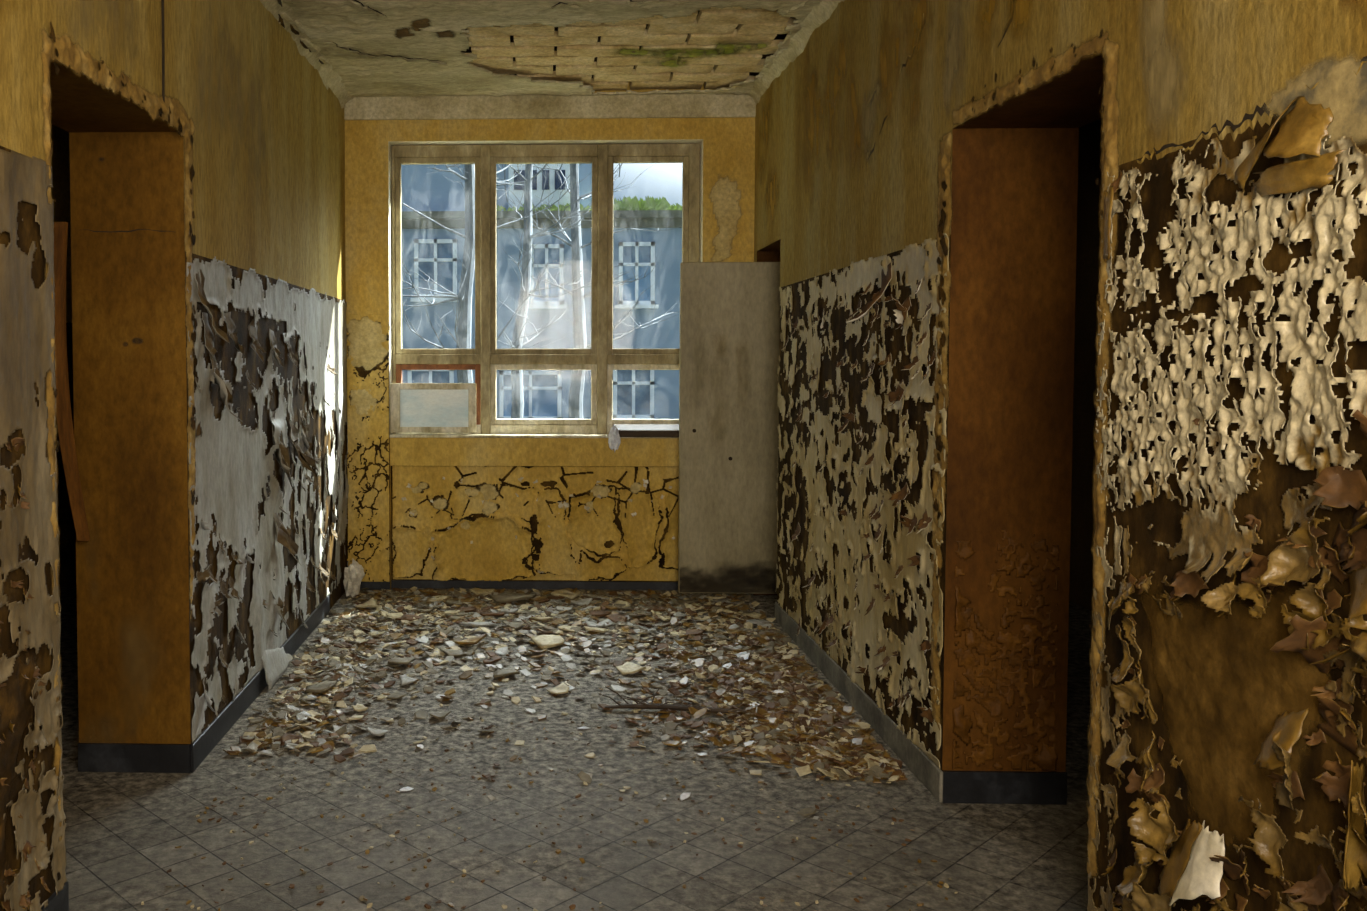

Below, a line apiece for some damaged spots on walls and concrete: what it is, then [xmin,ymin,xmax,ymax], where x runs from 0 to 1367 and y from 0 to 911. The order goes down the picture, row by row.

crack [348,0,386,16]
crack [324,41,447,64]
spalling [395,6,797,91]
flaking render [709,177,742,262]
peeling [0,22,679,911]
peeling [776,29,1367,911]